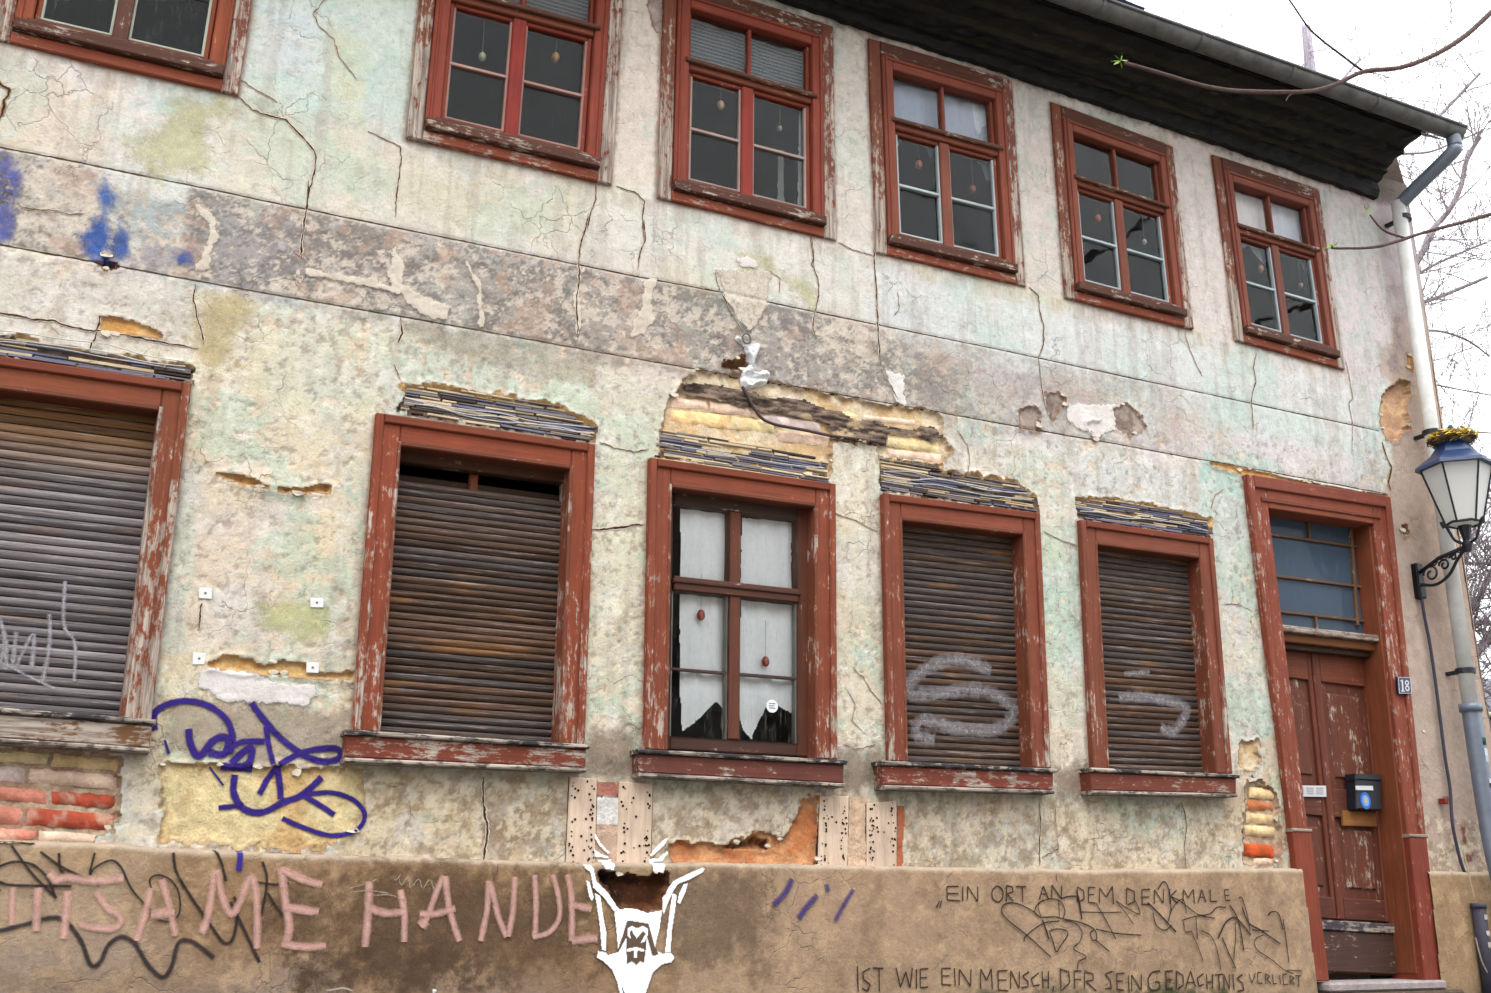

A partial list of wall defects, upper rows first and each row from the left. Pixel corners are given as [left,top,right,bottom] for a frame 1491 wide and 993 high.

crack [313,0,356,78]
crack [0,81,12,119]
crack [17,202,84,216]
crack [238,79,318,259]
crack [368,131,403,217]
crack [575,184,646,338]
flaking render [0,315,196,384]
flaking render [654,354,1040,513]
flaking render [1019,391,1147,441]
flaking render [0,746,124,843]
flaking render [1238,737,1283,868]
flaking render [597,793,822,913]